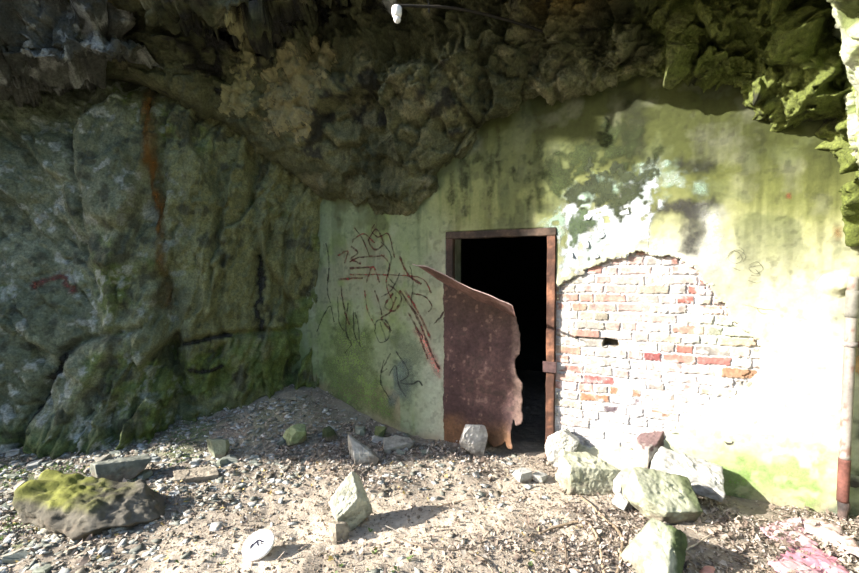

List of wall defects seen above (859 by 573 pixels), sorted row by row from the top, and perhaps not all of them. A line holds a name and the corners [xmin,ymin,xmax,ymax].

damp [527,93,662,248]
flaking render [546,163,762,449]
damp [681,208,721,268]
corrosion [836,458,851,504]